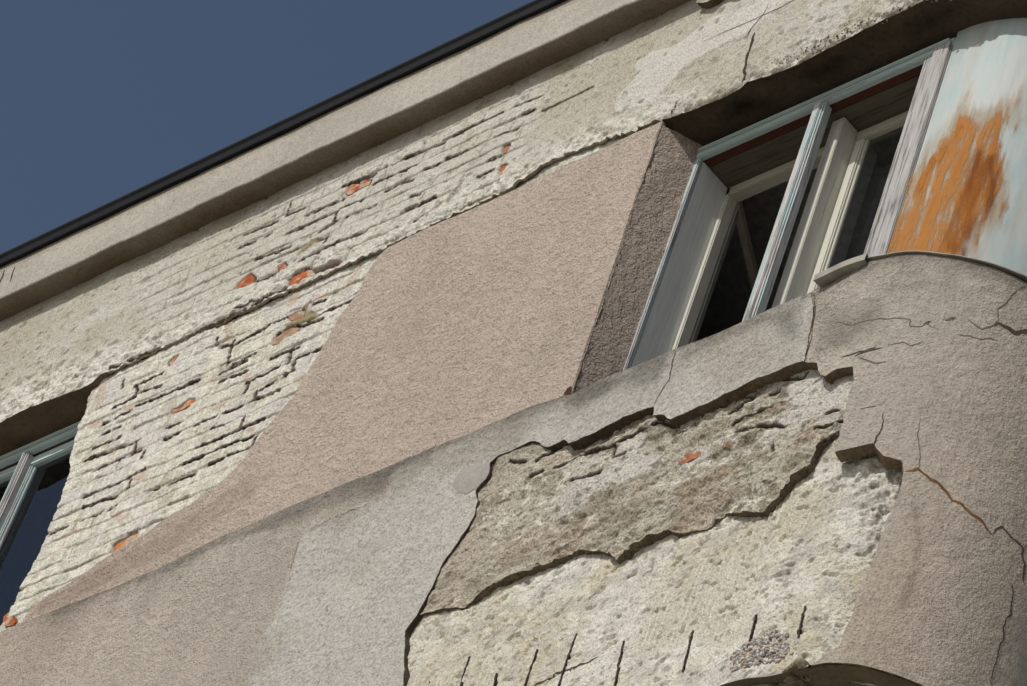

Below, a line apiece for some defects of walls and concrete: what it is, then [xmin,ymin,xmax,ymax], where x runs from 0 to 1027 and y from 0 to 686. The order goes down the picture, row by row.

crack [705,0,793,83]
peeling [0,251,383,632]
peeling [0,0,926,423]
spalling [407,370,903,686]
crack [859,406,884,444]
crack [804,286,1027,364]
rust [889,108,1008,256]
crack [907,418,1027,685]